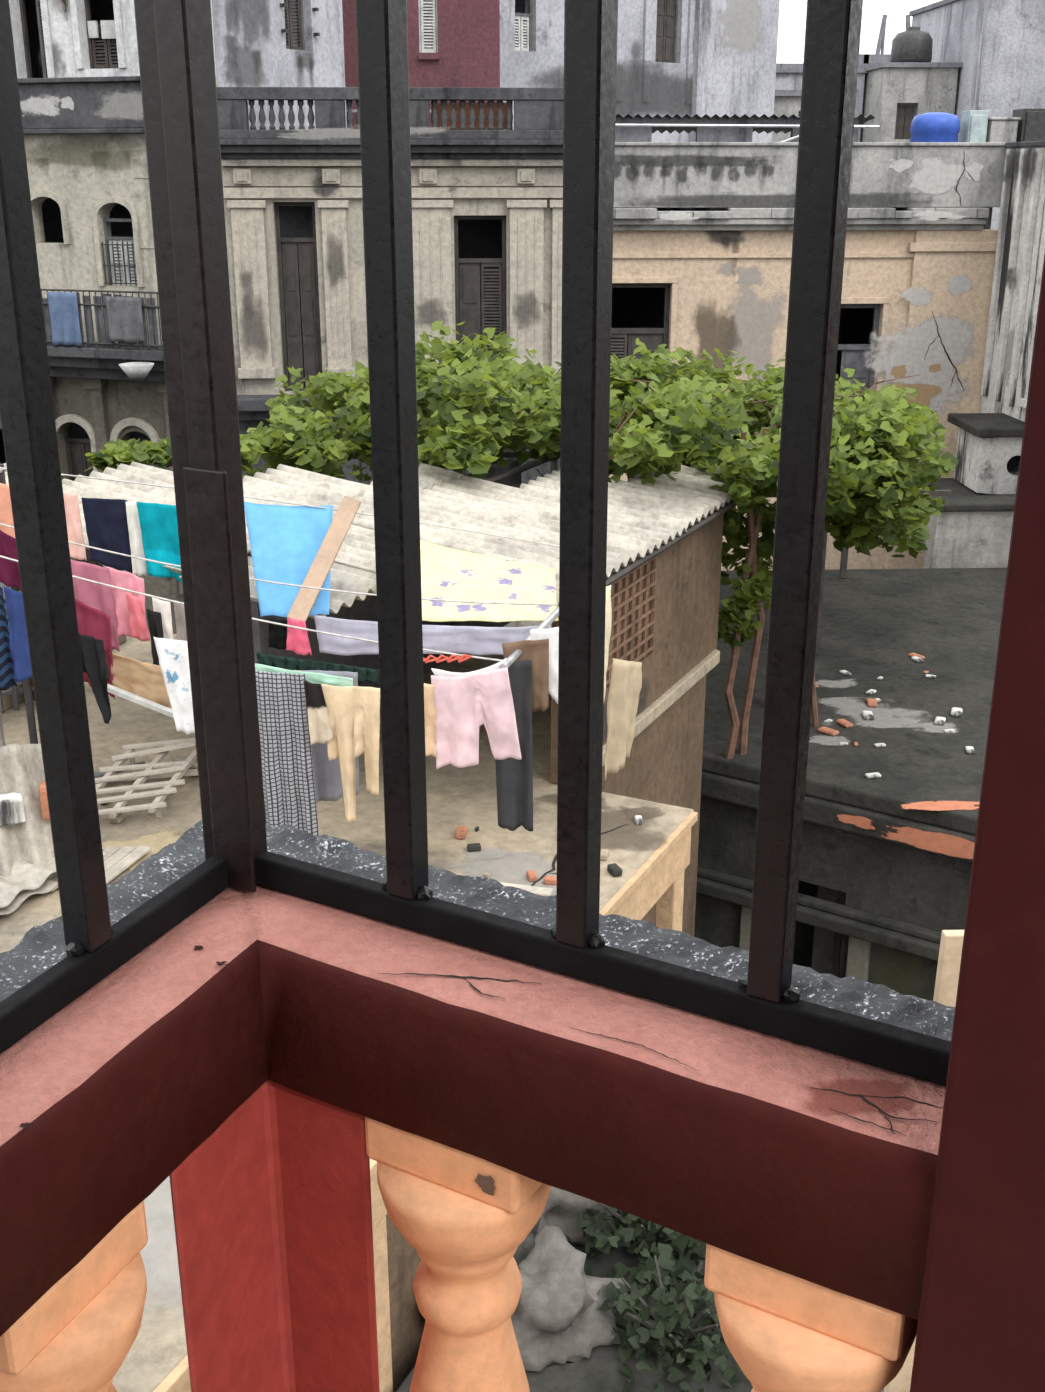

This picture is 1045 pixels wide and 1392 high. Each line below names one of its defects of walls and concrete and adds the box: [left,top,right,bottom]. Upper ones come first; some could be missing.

peeling [20,96,74,116]
peeling [102,93,143,119]
damp [709,230,741,244]
damp [696,307,737,371]
peeling [866,287,974,416]
crack [925,312,965,391]
crack [379,973,542,999]
crack [810,1087,943,1136]
peeling [474,1174,495,1195]